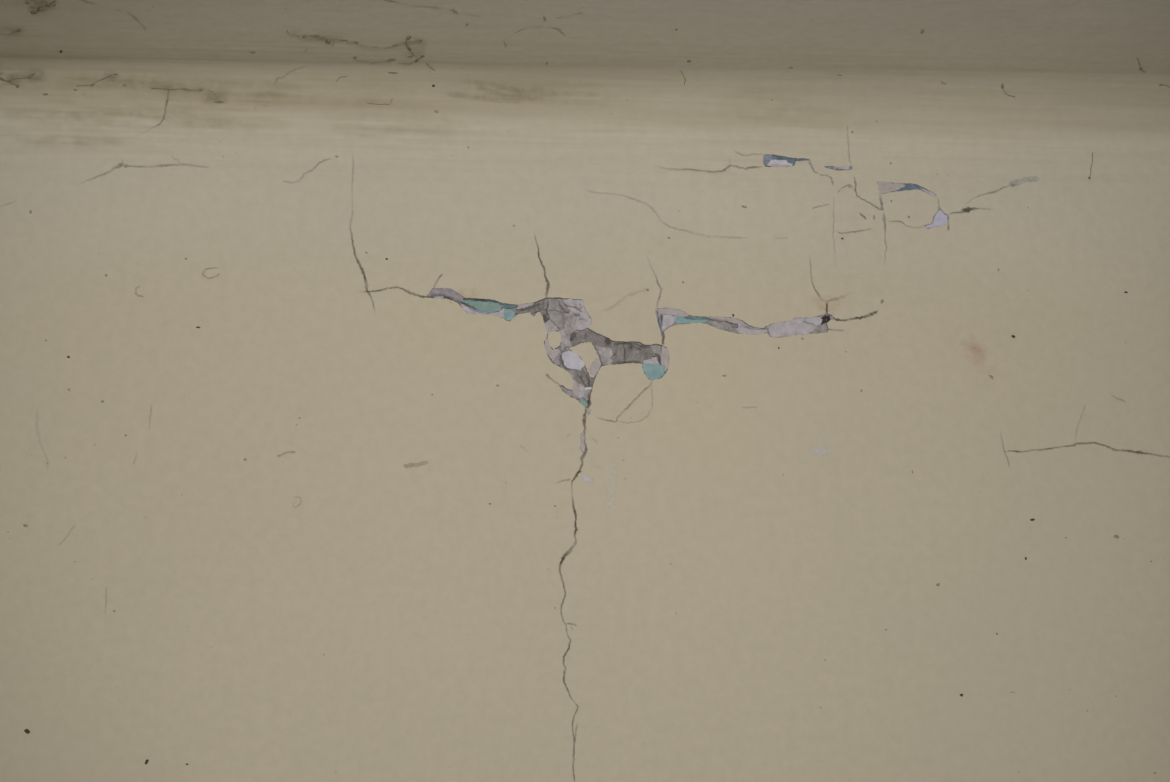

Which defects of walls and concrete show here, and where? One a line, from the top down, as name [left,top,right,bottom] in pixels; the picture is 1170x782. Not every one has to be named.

peeling [763,154,809,167]
peeling [877,181,948,229]
spalling [426,288,836,408]
crack [573,400,591,480]